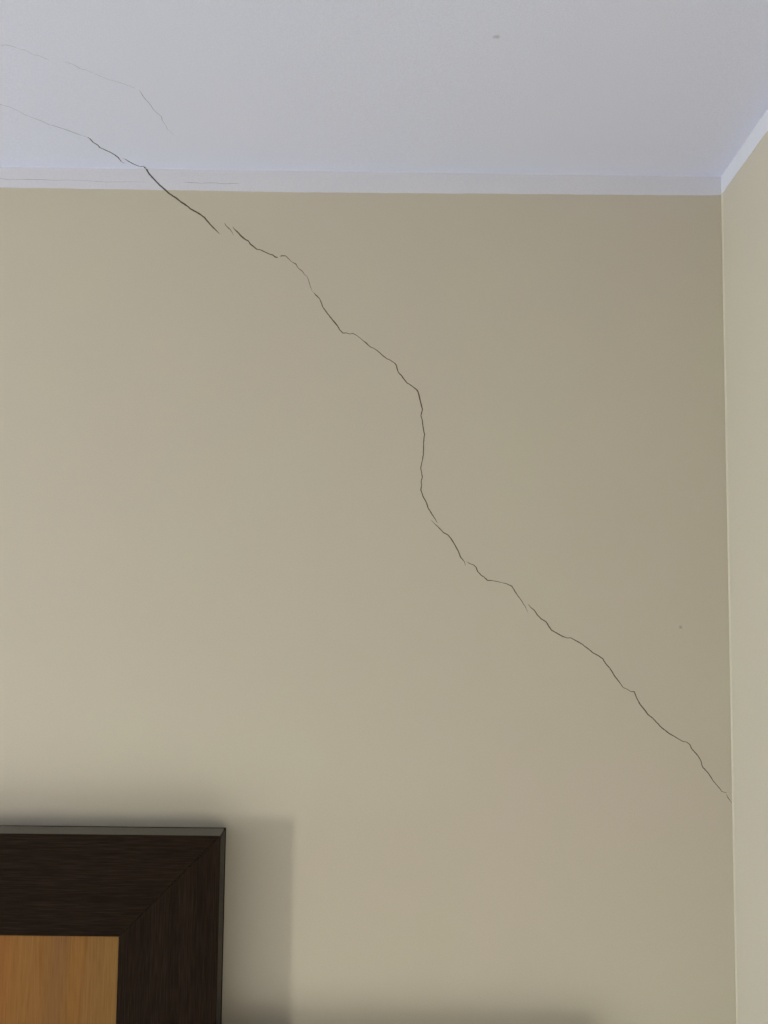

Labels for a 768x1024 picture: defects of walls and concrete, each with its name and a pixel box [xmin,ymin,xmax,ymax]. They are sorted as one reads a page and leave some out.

crack [0,104,732,803]